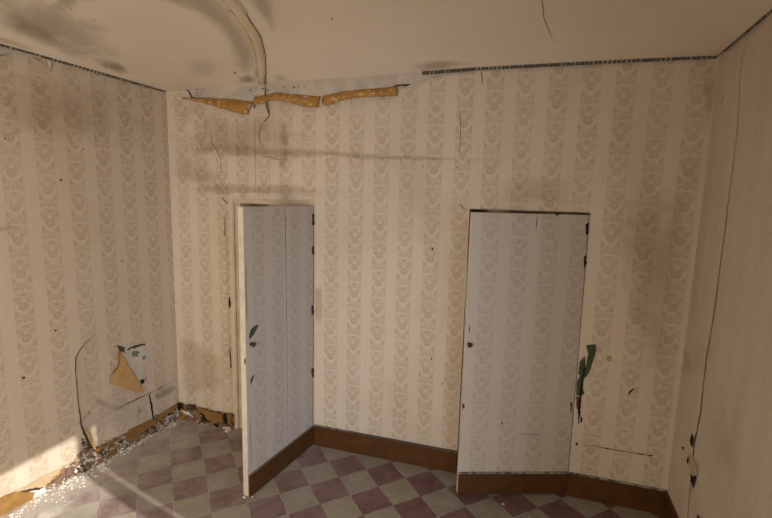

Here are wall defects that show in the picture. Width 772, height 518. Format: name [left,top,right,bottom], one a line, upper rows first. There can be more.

crack [235,0,281,160]
flaking render [185,71,466,108]
crack [75,333,98,449]
crack [103,381,173,419]
peeling [0,403,232,517]